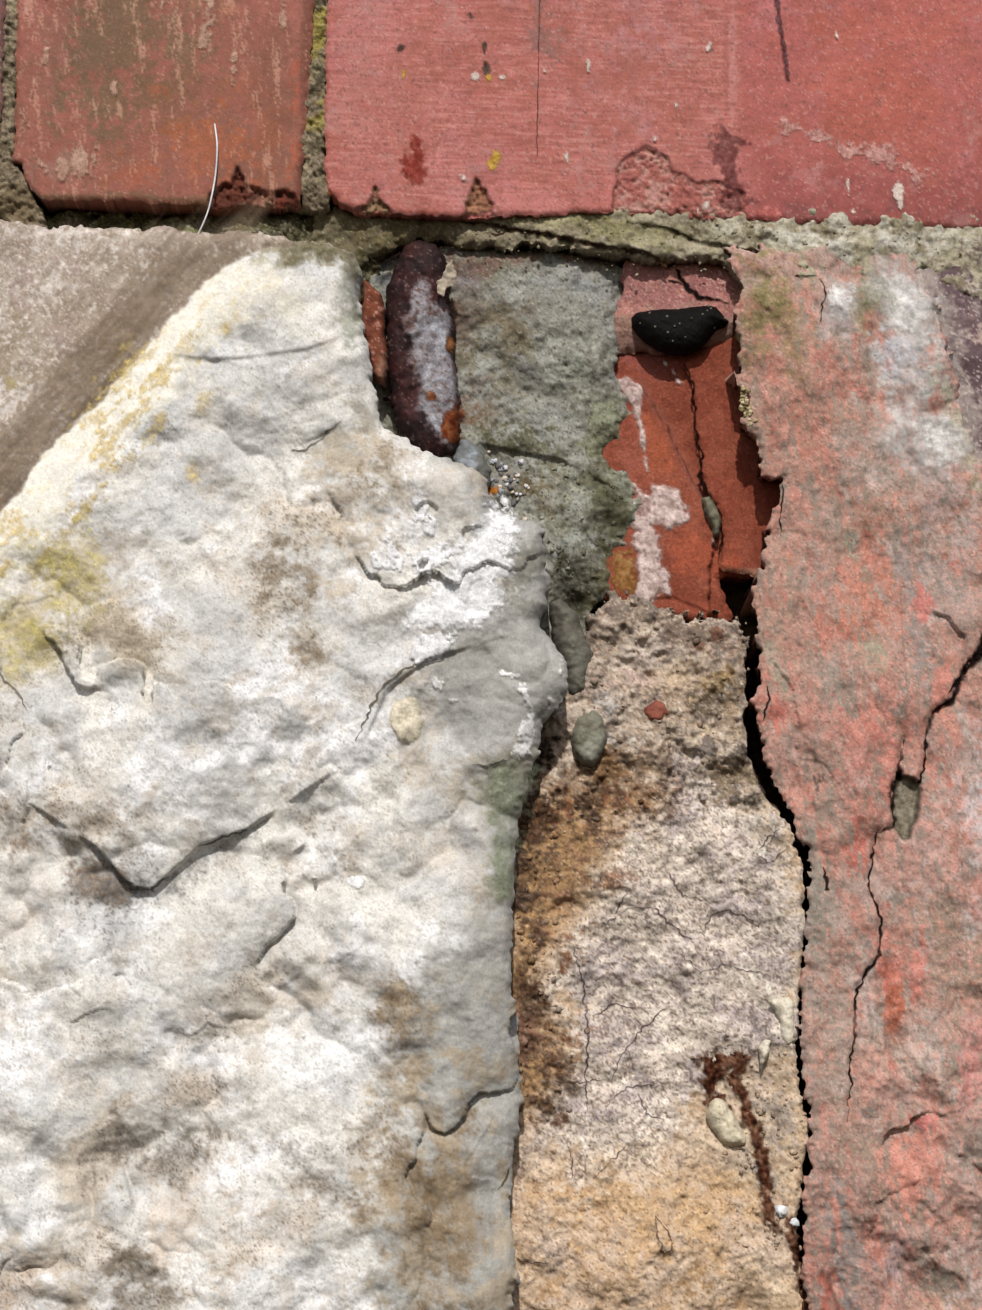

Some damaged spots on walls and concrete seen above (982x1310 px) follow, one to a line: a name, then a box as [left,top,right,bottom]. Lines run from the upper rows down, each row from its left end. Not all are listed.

spalling [612,146,745,215]
corrosion [446,337,456,353]
corrosion [441,403,464,446]
spalling [601,259,782,623]
crack [763,686,771,720]
crack [198,829,247,847]
crack [111,865,168,891]
crack [822,867,830,890]
crack [847,635,982,1121]
crack [605,862,767,975]
crack [554,945,669,1120]
corrosion [696,1035,809,1310]